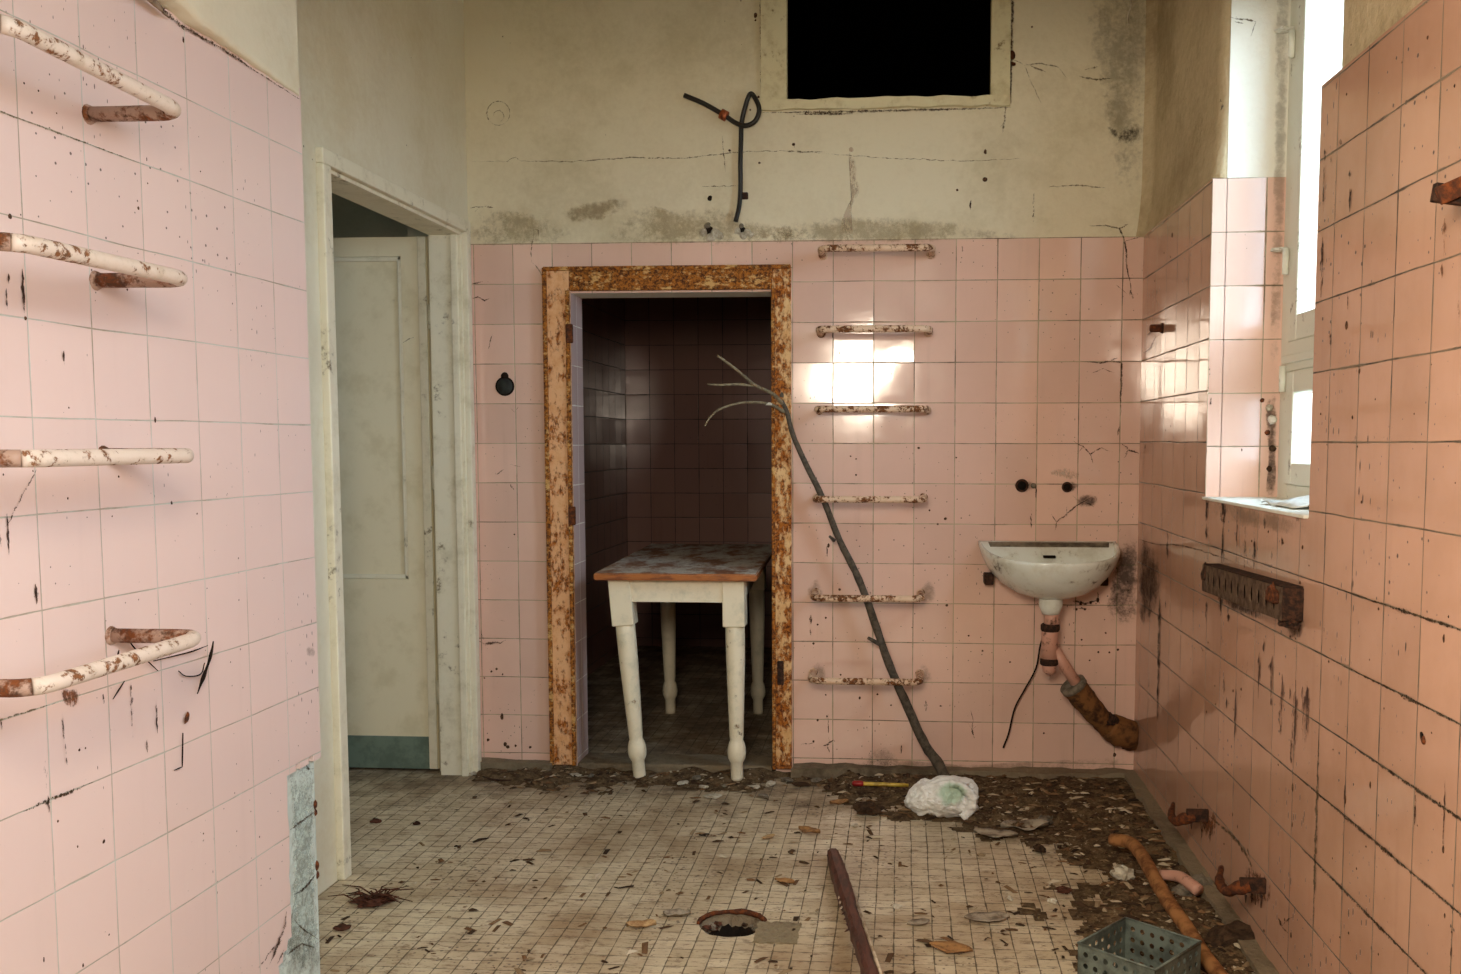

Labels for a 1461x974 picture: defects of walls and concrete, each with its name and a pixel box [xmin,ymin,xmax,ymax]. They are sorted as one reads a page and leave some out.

flaking render [147,0,299,99]
damp [1111,541,1168,618]
spalling [287,765,319,967]